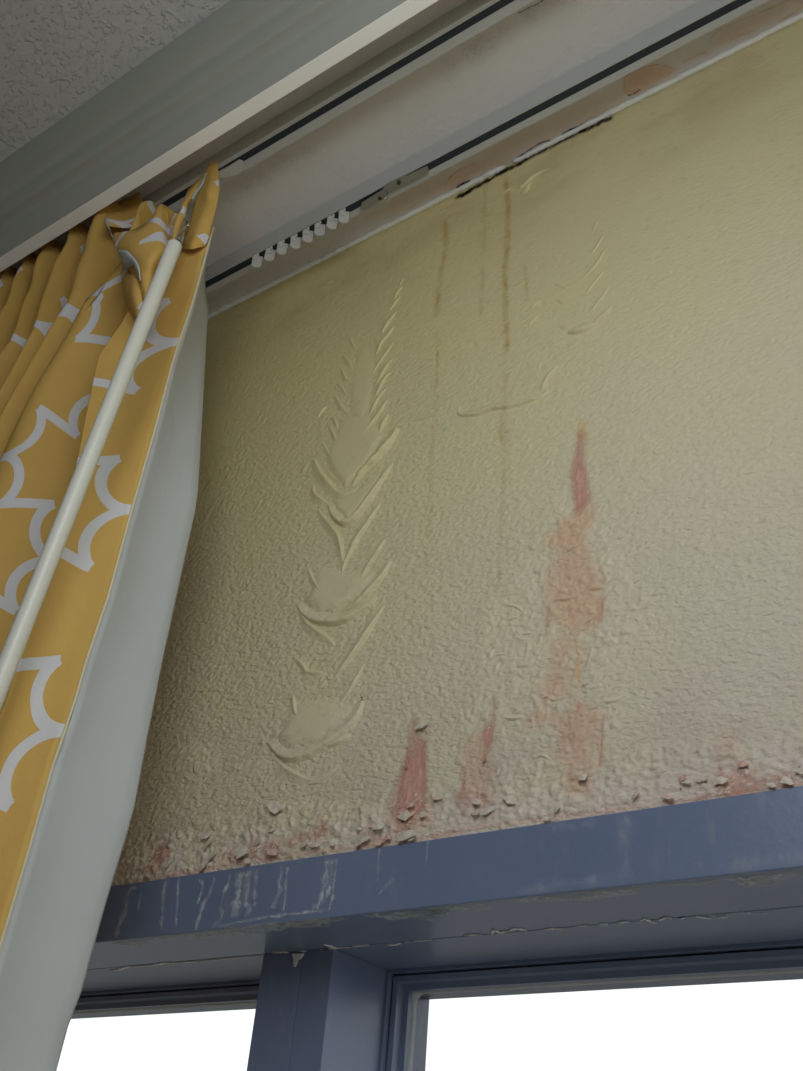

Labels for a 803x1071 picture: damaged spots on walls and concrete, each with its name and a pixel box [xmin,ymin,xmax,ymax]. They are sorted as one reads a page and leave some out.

rust [396,742,426,821]
crack [463,915,728,936]
crack [110,939,432,971]